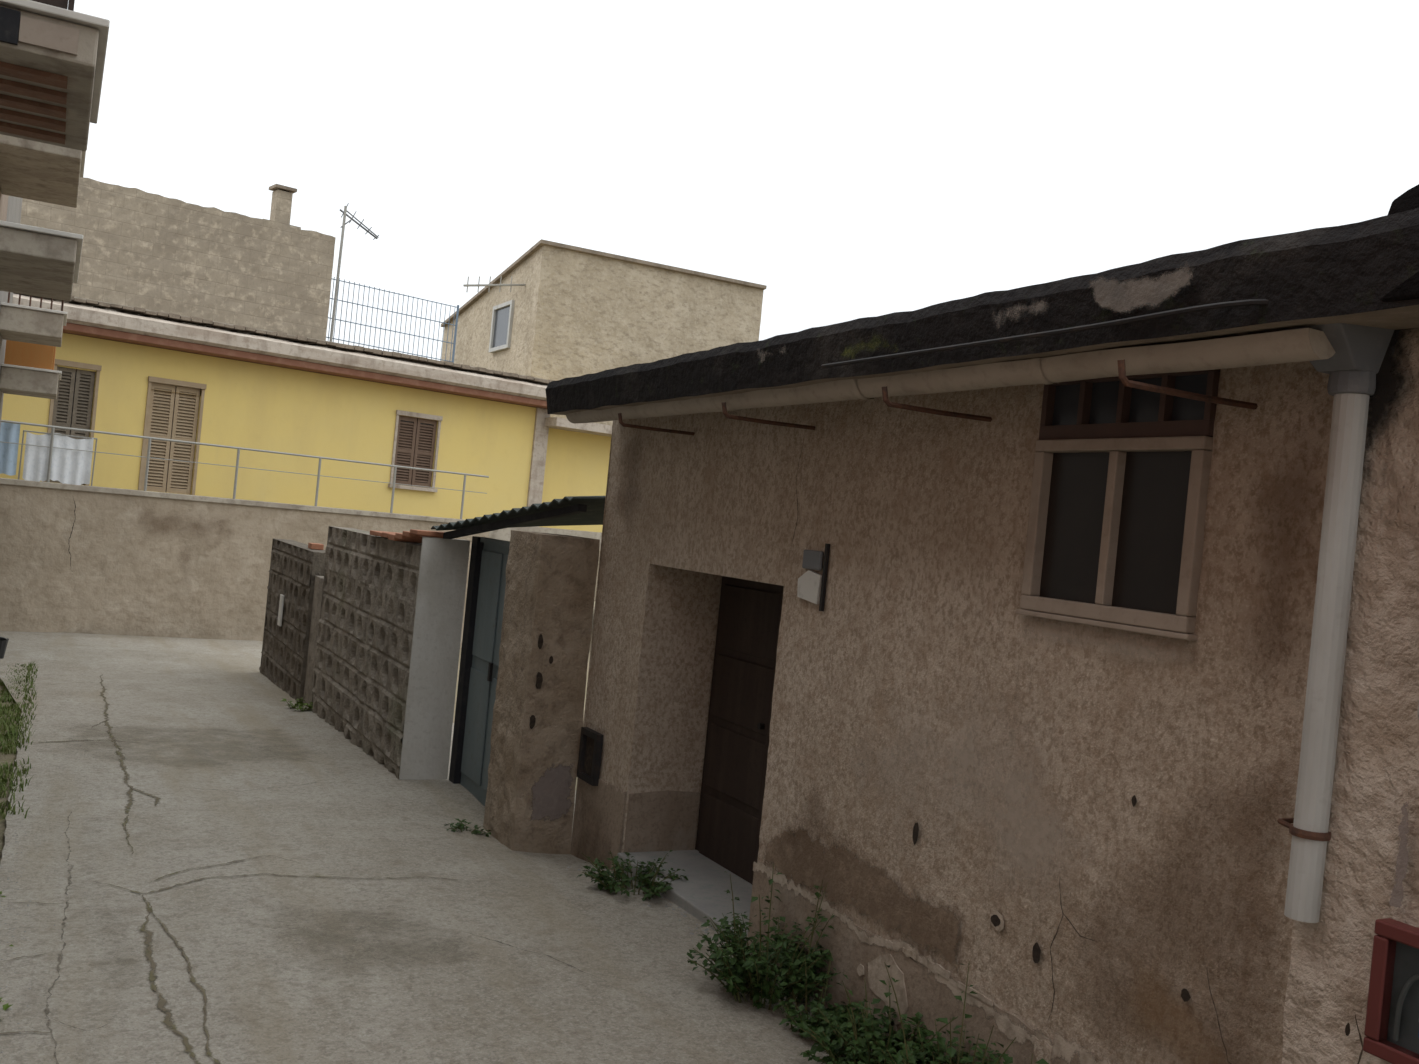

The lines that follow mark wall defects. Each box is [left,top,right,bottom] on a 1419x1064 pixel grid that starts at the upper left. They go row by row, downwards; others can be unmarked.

peeling [997,301,1045,325]
peeling [1090,267,1192,312]
crack [0,674,484,1064]
flaking render [753,862,1115,1064]